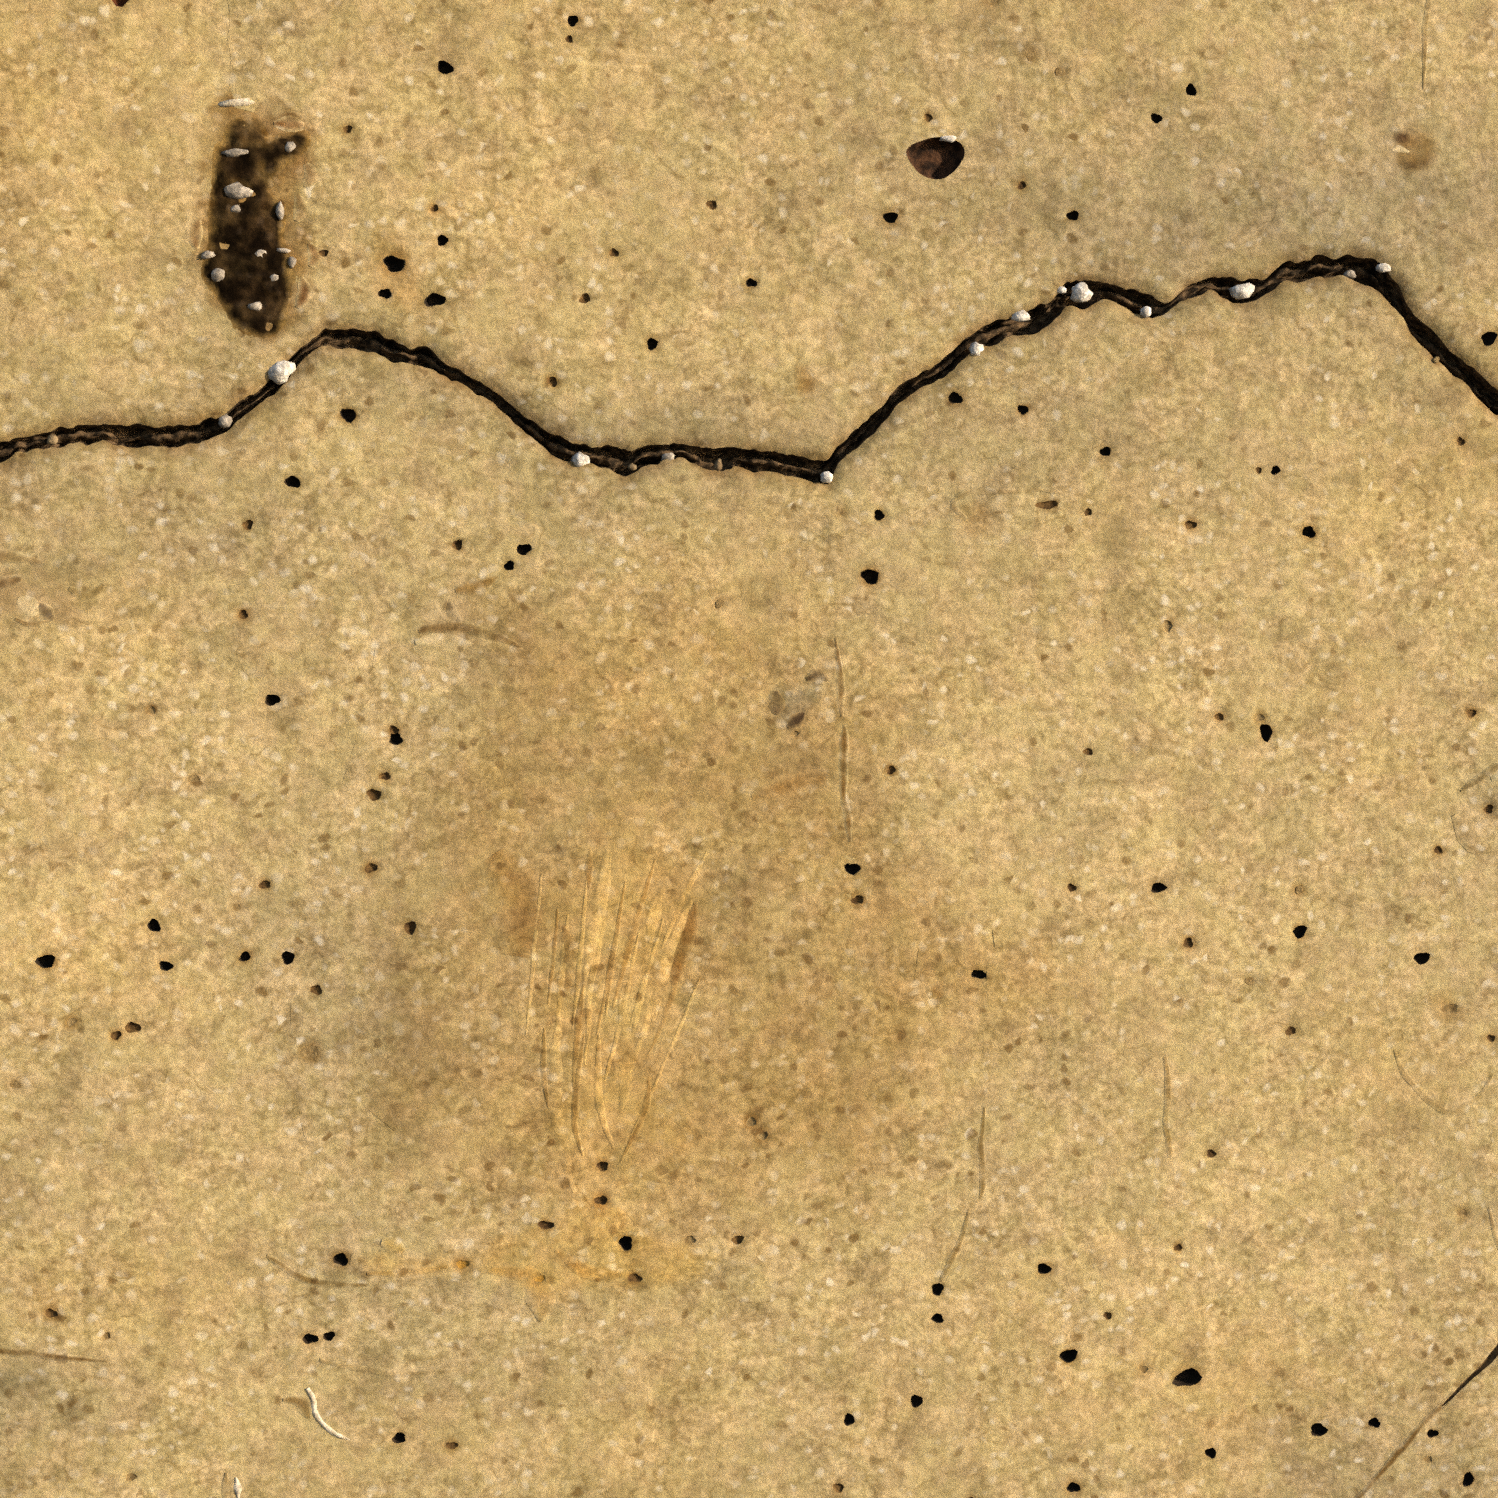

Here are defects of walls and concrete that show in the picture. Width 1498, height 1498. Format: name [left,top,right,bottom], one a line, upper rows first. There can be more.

crack [0,255,1498,485]
crack [950,487,1061,521]